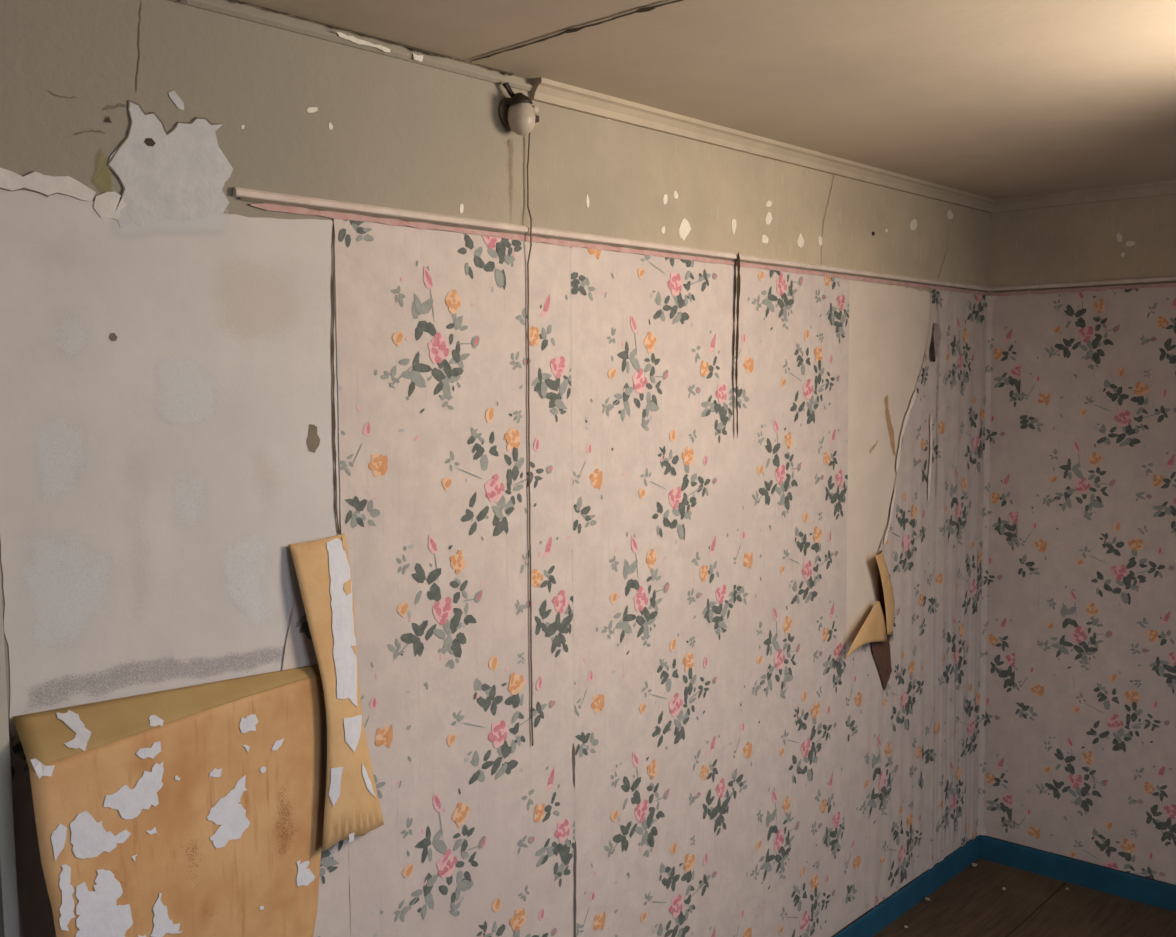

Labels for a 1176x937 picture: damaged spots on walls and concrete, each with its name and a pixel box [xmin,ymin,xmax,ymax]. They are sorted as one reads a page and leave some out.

crack [74,0,142,135]
crack [233,0,684,76]
flaking render [0,91,384,852]
peeling [845,552,895,690]